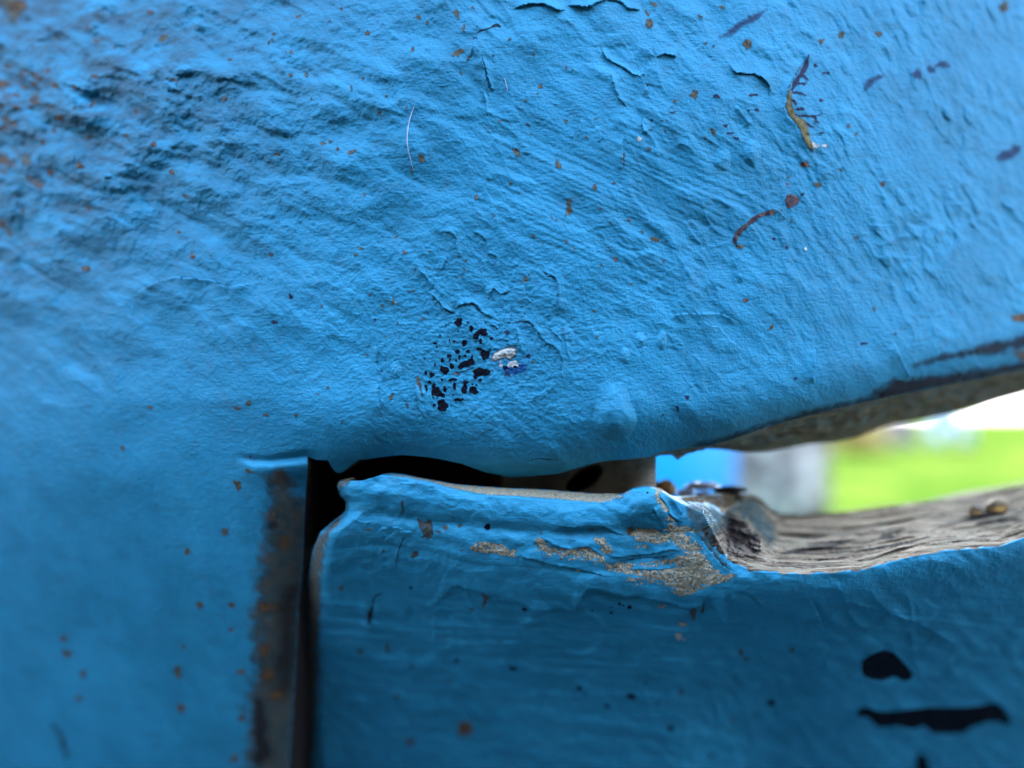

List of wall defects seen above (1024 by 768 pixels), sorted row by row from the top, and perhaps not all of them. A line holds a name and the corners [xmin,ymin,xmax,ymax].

peeling [511,0,641,11]
peeling [415,222,577,419]
rust [229,472,349,768]
peeling [349,516,433,558]
peeling [388,474,778,641]